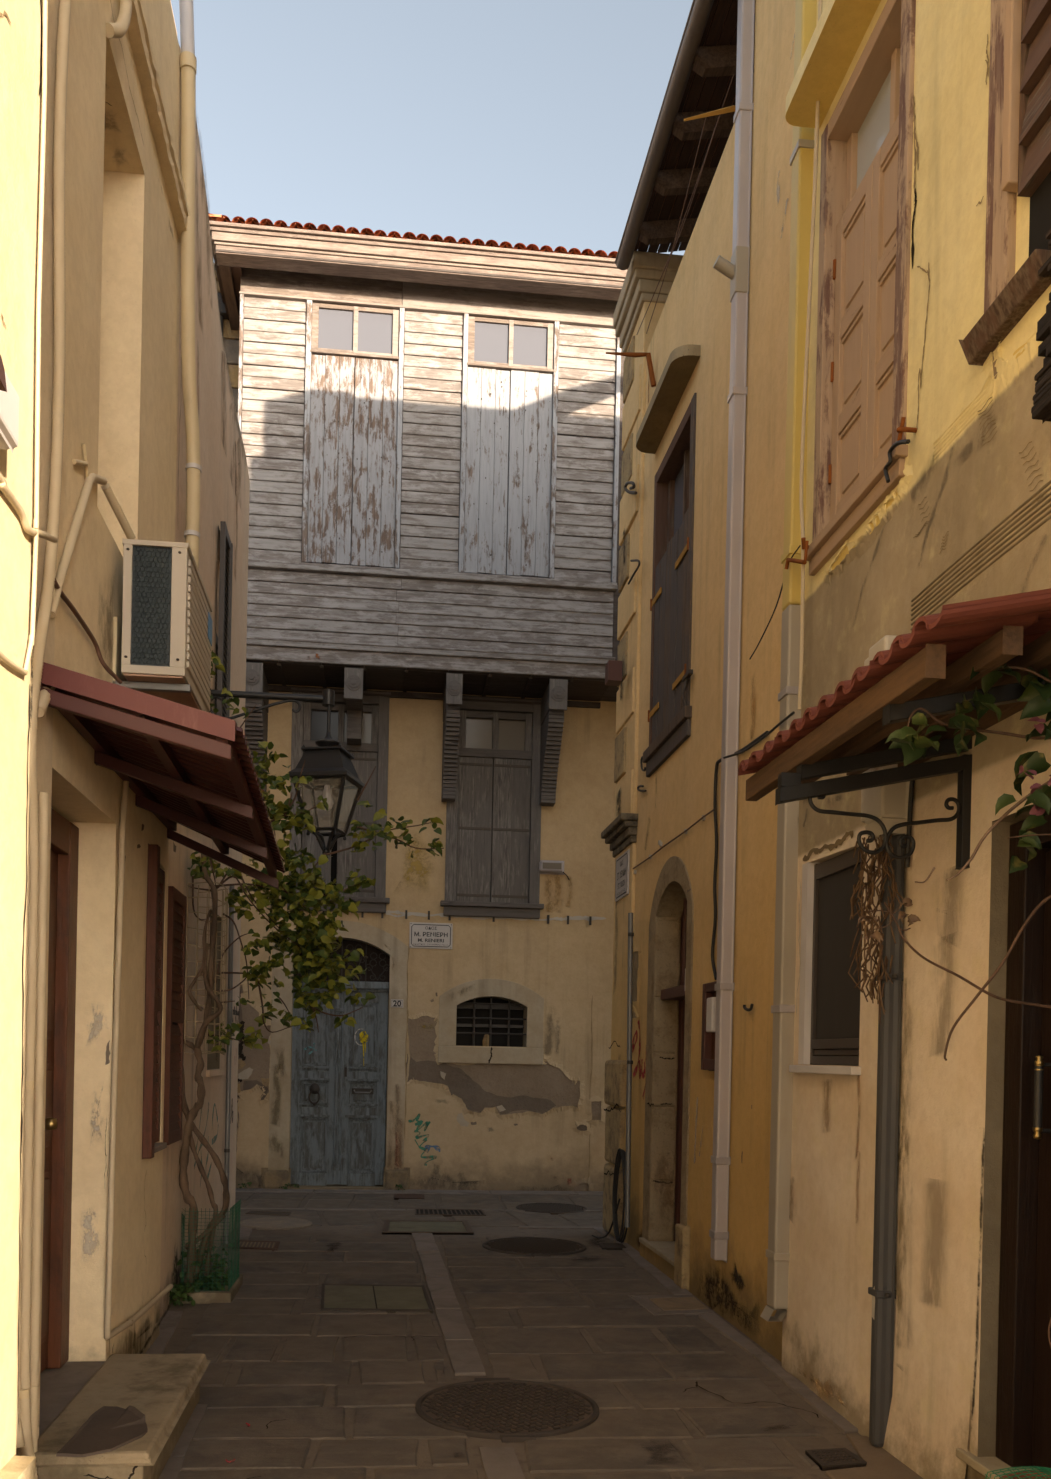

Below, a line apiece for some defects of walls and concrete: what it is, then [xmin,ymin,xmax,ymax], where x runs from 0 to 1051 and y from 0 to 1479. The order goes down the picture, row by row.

flaking render [236,981,271,1177]
flaking render [405,992,607,1137]
damp [702,1264,756,1328]